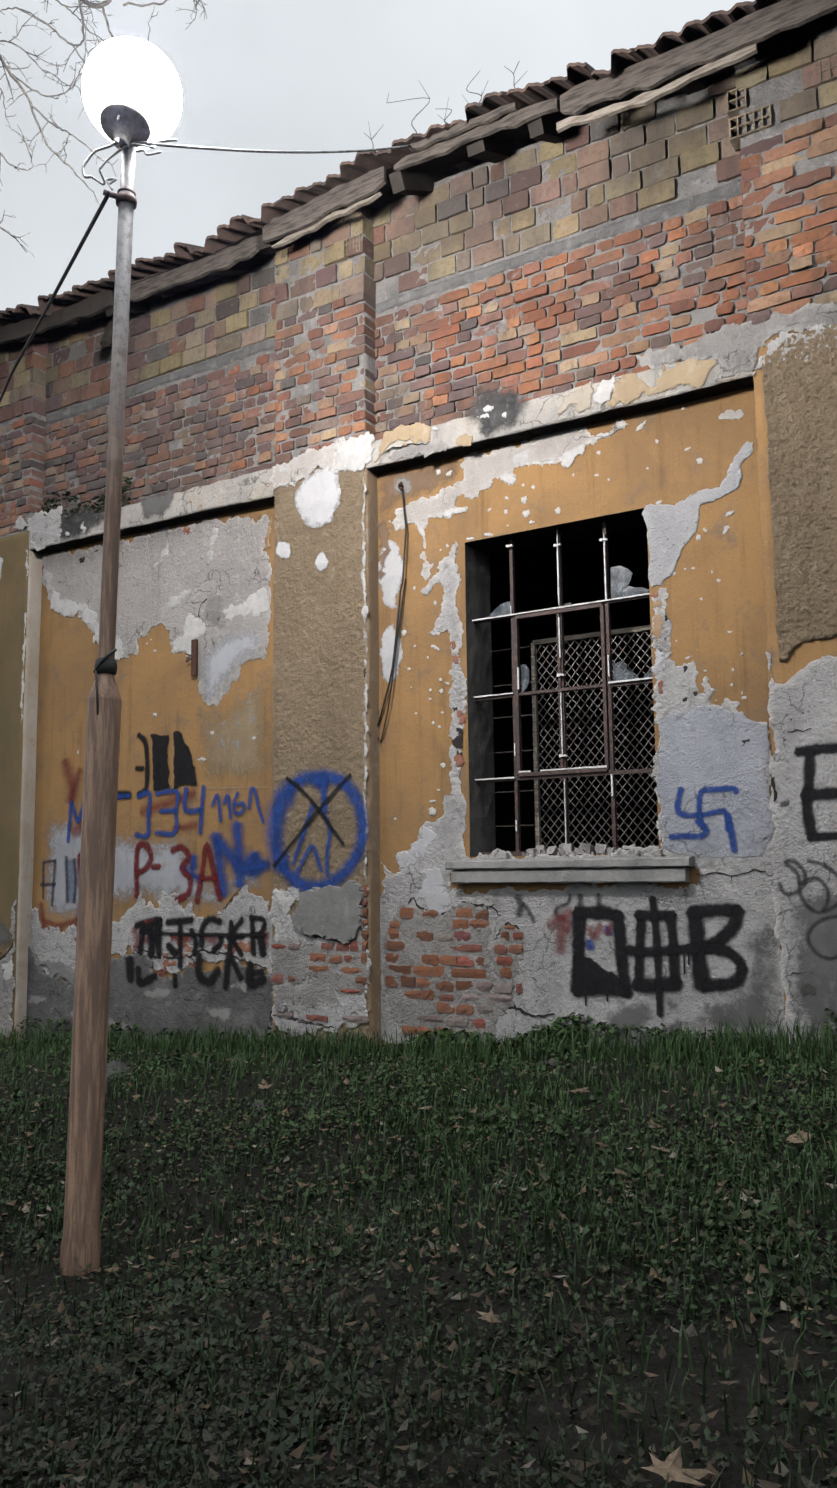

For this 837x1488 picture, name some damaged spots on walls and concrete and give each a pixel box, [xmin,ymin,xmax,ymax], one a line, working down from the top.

flaking render [12,506,273,707]
flaking render [108,301,837,1052]
flaking render [0,900,77,1041]